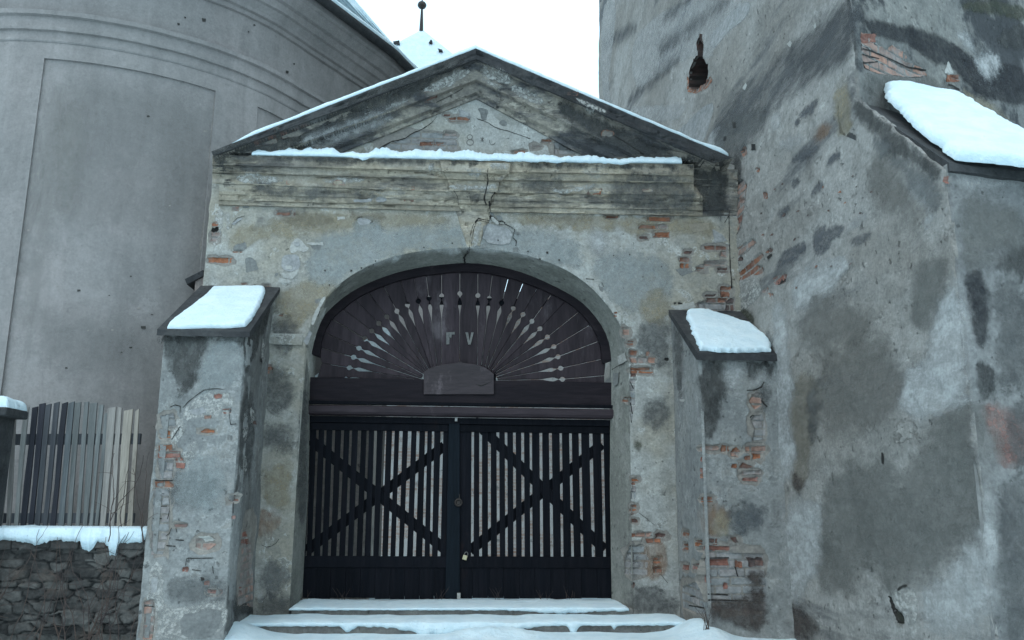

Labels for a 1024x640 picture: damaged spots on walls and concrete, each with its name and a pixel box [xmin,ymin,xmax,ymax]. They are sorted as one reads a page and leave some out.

flaking render [860,32,927,77]
leakage [304,109,434,171]
leakage [449,160,497,190]
crack [454,170,519,264]
flaking render [637,216,675,242]
flaking render [671,179,797,311]
leakage [162,336,206,396]
leakage [696,361,728,438]
flaking render [696,389,771,486]
leakage [965,245,1024,464]
peeling [138,392,264,640]
flaking render [620,475,769,622]